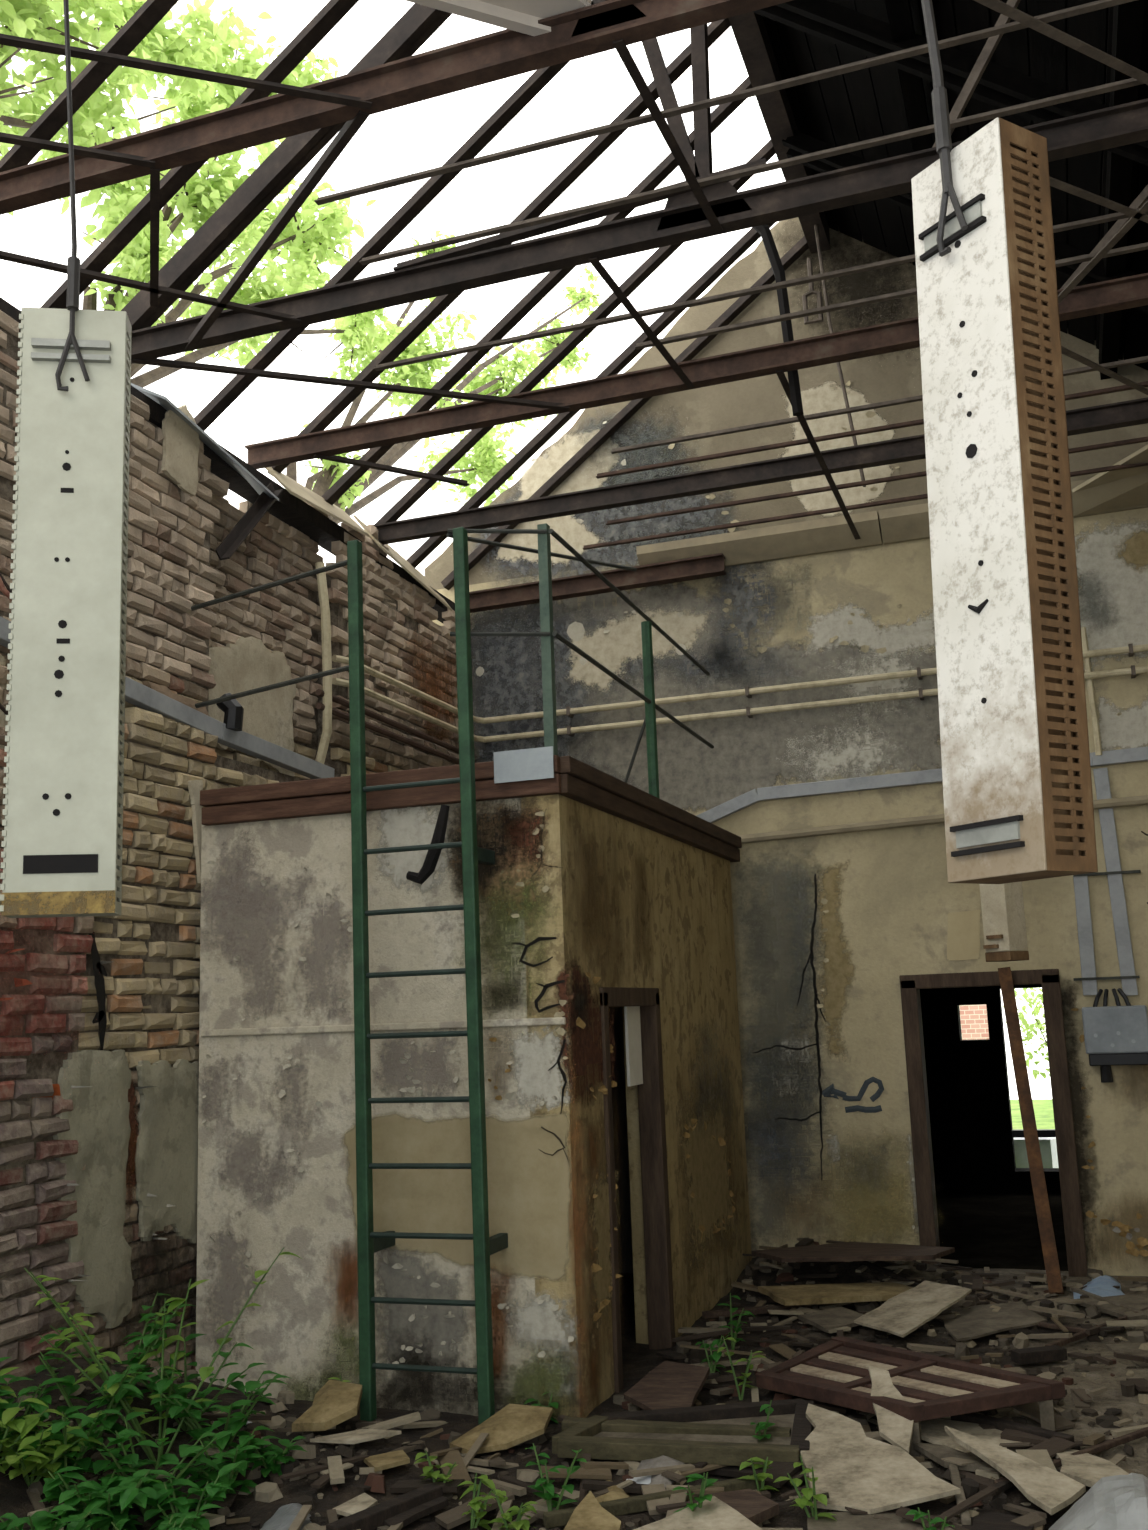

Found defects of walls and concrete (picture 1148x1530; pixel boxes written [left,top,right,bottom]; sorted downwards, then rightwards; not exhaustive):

leakage [476,493,739,584]
leakage [581,417,687,488]
peeling [782,380,894,457]
peeling [788,465,900,517]
leakage [471,608,544,762]
peeling [471,582,942,811]
peeling [1075,521,1148,751]
crack [511,937,570,1165]
leakage [739,859,916,1242]